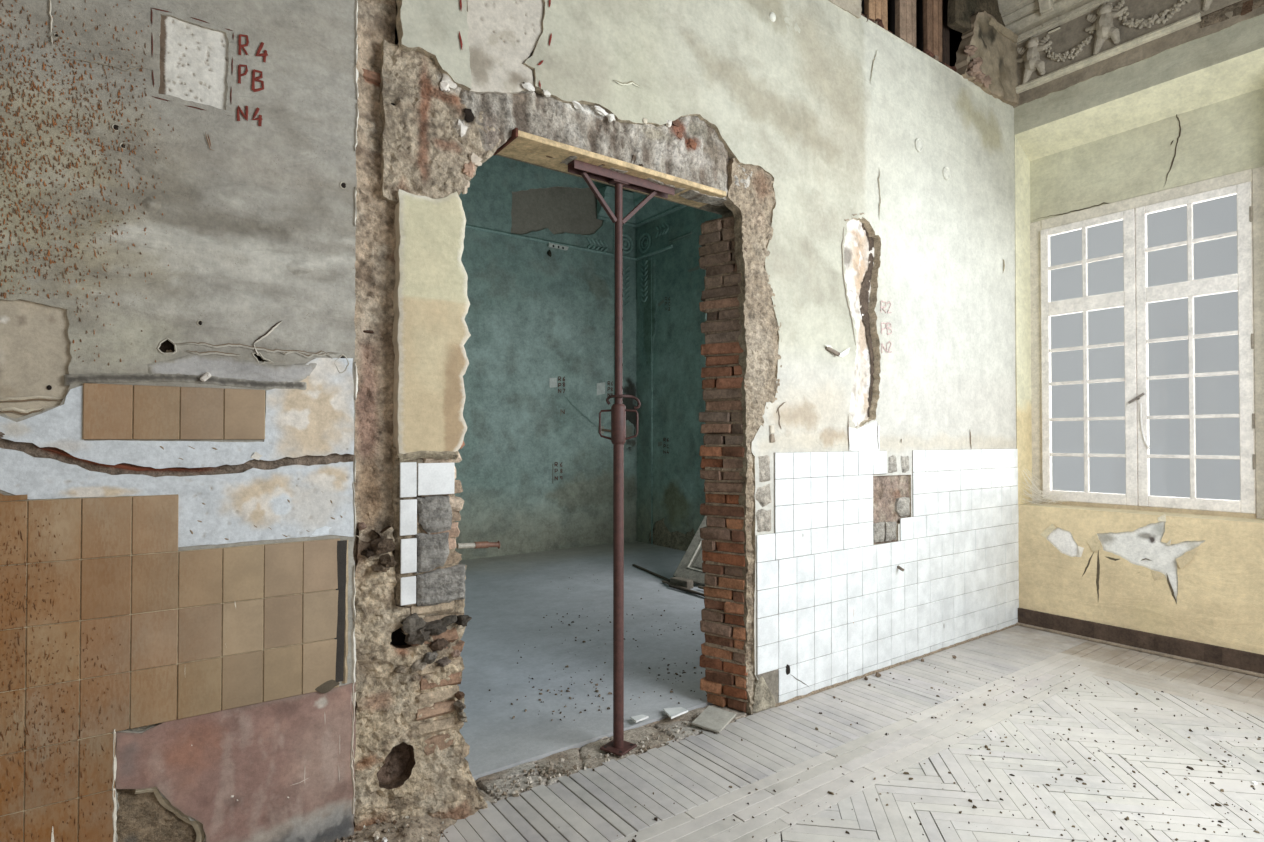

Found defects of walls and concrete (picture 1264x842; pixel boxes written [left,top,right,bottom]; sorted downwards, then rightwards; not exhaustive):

flaking render [572,101,616,122]
crack [1164,114,1181,186]
flaking render [511,187,603,235]
flaking render [0,0,552,842]
spalling [873,455,910,544]
peeling [1040,514,1206,604]